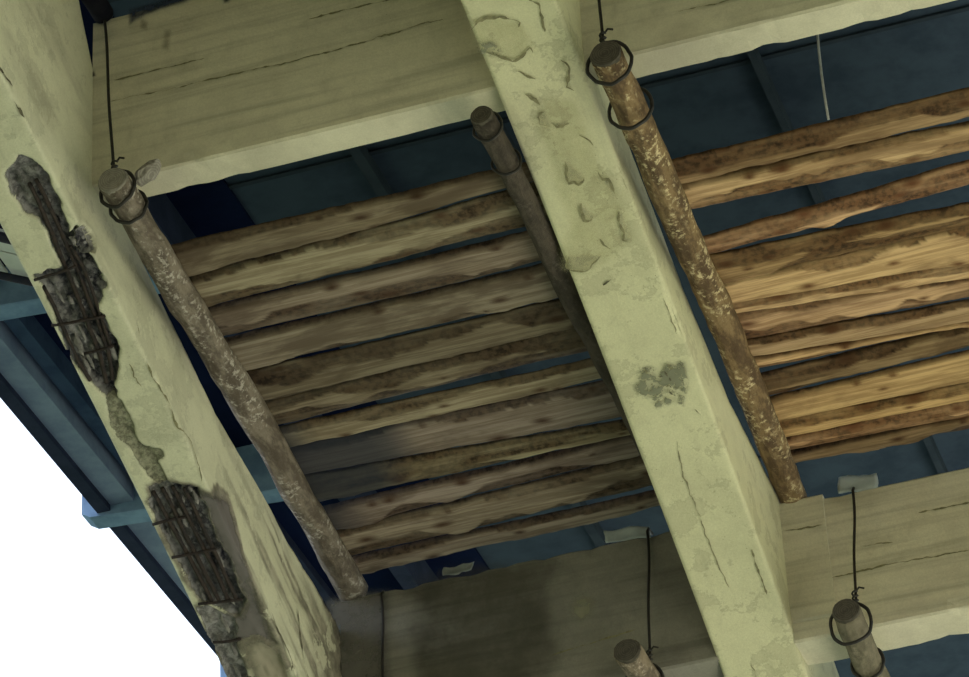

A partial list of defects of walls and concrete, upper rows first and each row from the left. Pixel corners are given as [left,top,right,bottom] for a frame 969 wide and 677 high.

peeling [471,16,520,30]
peeling [481,42,535,79]
peeling [525,94,569,128]
peeling [636,362,687,407]
spalling [5,154,268,677]
crack [677,443,729,587]
leakage [330,594,385,677]